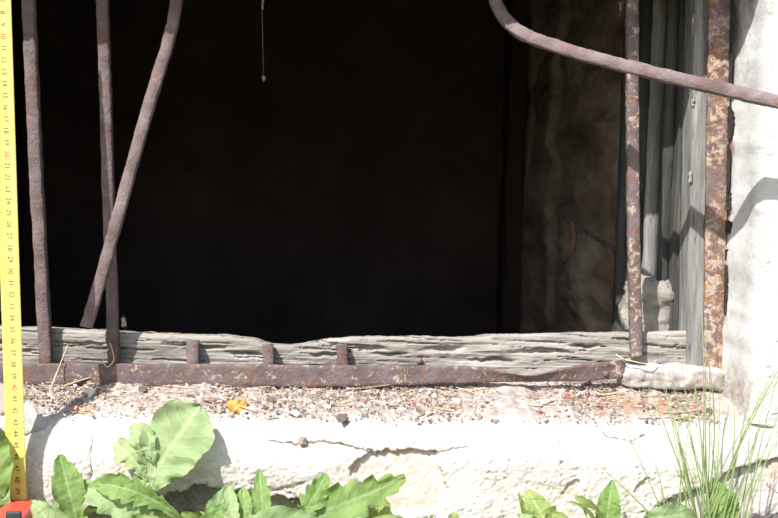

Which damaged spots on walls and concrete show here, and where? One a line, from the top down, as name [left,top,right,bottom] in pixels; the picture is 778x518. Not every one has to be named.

crack [268,439,381,453]
spalling [352,449,445,512]